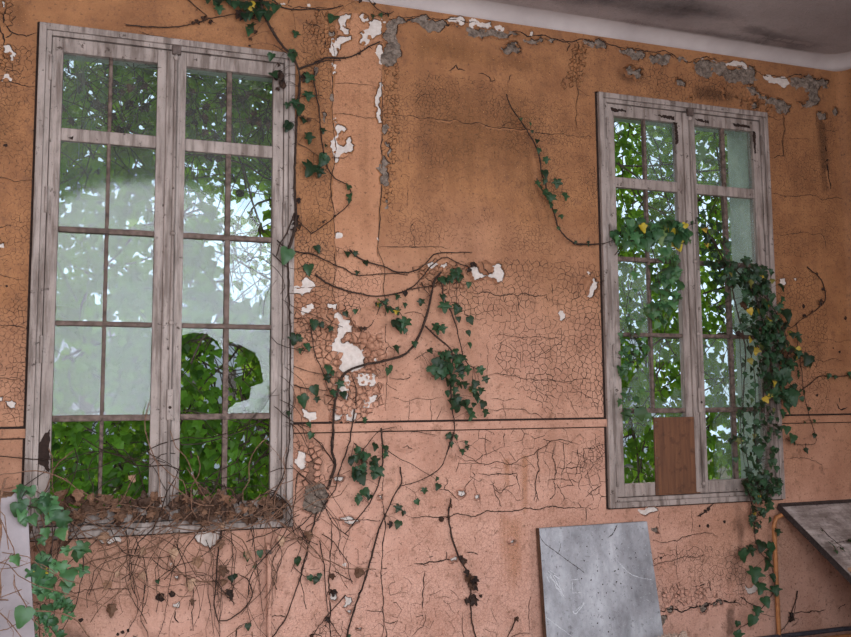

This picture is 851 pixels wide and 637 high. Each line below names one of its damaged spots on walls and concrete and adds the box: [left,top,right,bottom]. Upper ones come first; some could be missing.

peeling [2,43,18,61]
flaking render [582,37,608,51]
flaking render [619,46,839,123]
peeling [321,111,355,164]
flaking render [374,82,392,209]
peeling [466,261,506,285]
peeling [294,276,316,315]
crack [283,4,831,637]
peeling [326,302,384,423]
flaking render [301,408,317,422]
flaking render [293,449,308,472]
crack [788,593,845,615]